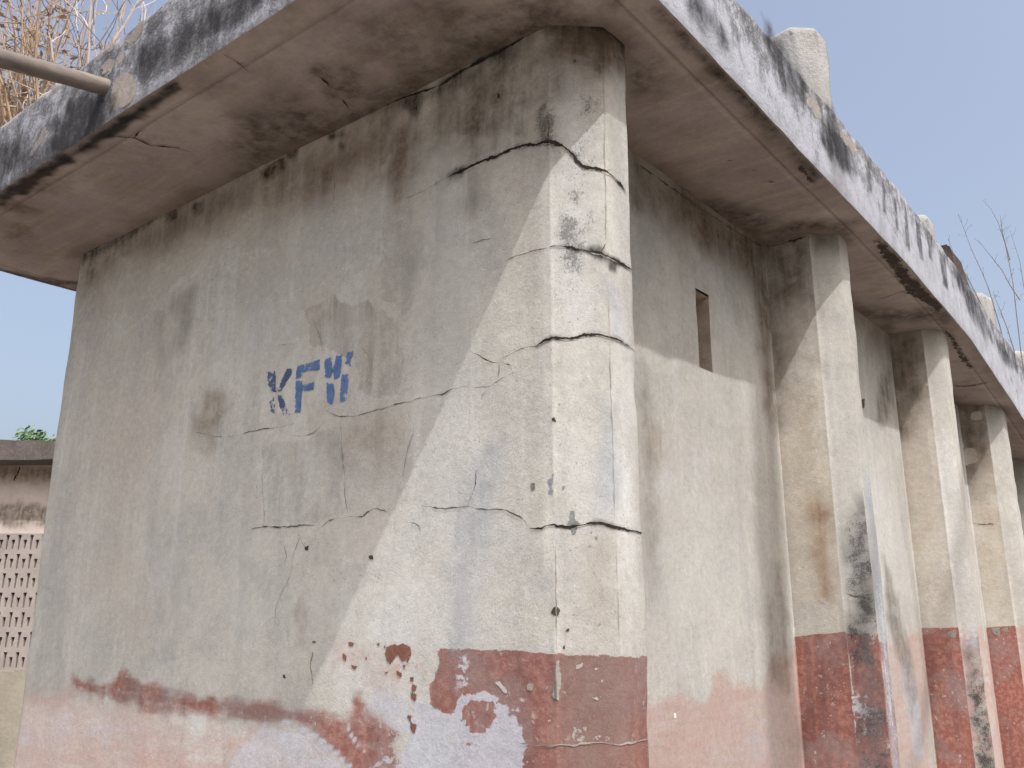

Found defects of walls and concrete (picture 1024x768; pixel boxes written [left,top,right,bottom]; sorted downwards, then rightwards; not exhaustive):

mould [205,8,237,34]
leakage [767,24,806,103]
leakage [0,83,180,207]
crack [407,70,631,270]
leakage [821,104,851,173]
leakage [941,258,1016,367]
crack [252,322,642,643]
peeling [376,643,417,701]
peeling [527,646,565,700]
leakage [847,480,904,768]
mould [968,657,995,768]